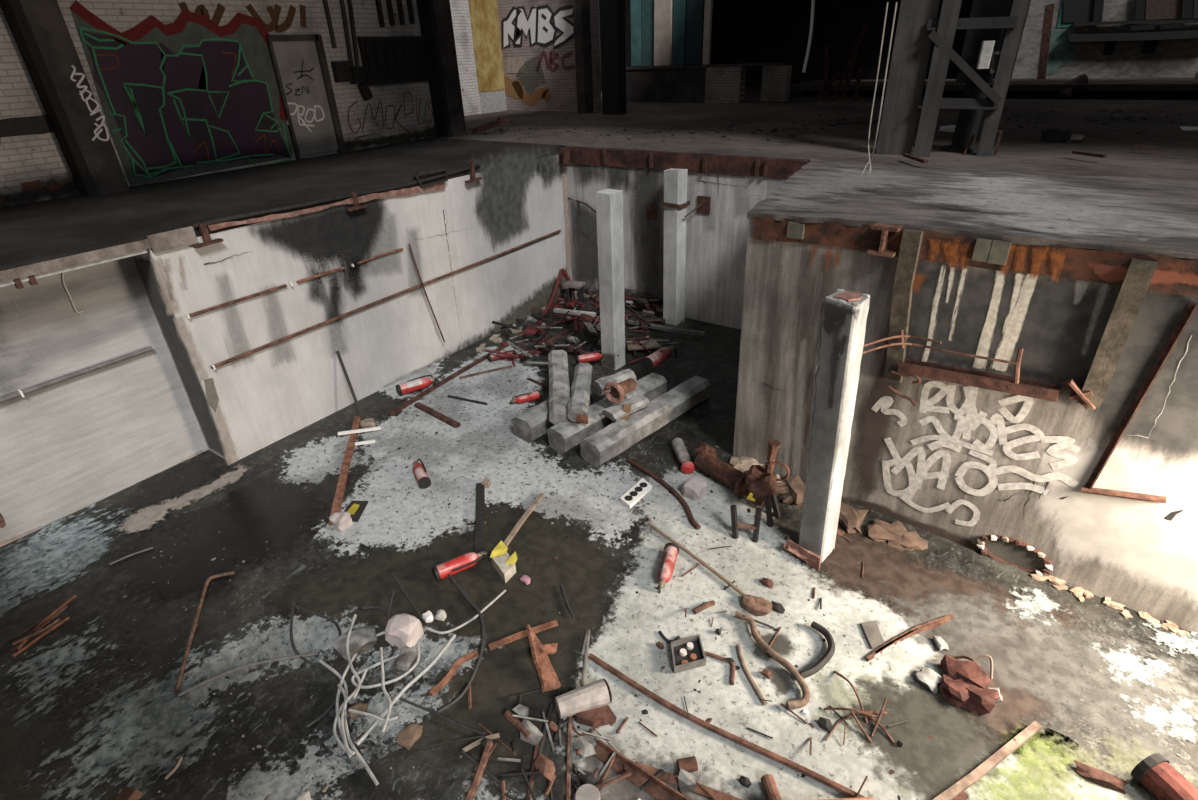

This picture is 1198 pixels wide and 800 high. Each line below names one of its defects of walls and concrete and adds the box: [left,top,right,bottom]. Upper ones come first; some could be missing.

leakage [258,199,422,360]
leakage [384,148,664,387]
corrosion [912,239,970,293]
leakage [905,264,1119,388]
corrosion [1001,244,1067,282]
corrosion [1150,270,1198,285]
leakage [0,501,130,618]
leakage [0,617,248,800]